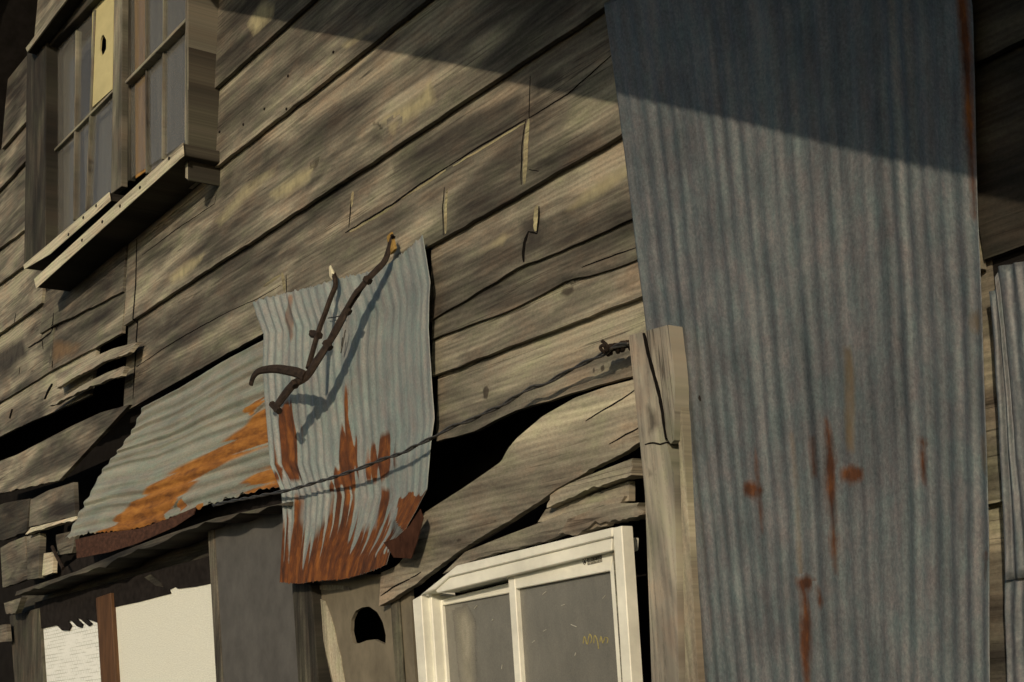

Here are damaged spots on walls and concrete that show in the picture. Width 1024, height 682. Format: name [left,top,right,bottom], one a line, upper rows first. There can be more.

crack [345,55,611,262]
corrosion [91,361,427,584]
crack [586,333,670,445]
corrosion [741,444,769,537]
corrosion [787,412,868,682]